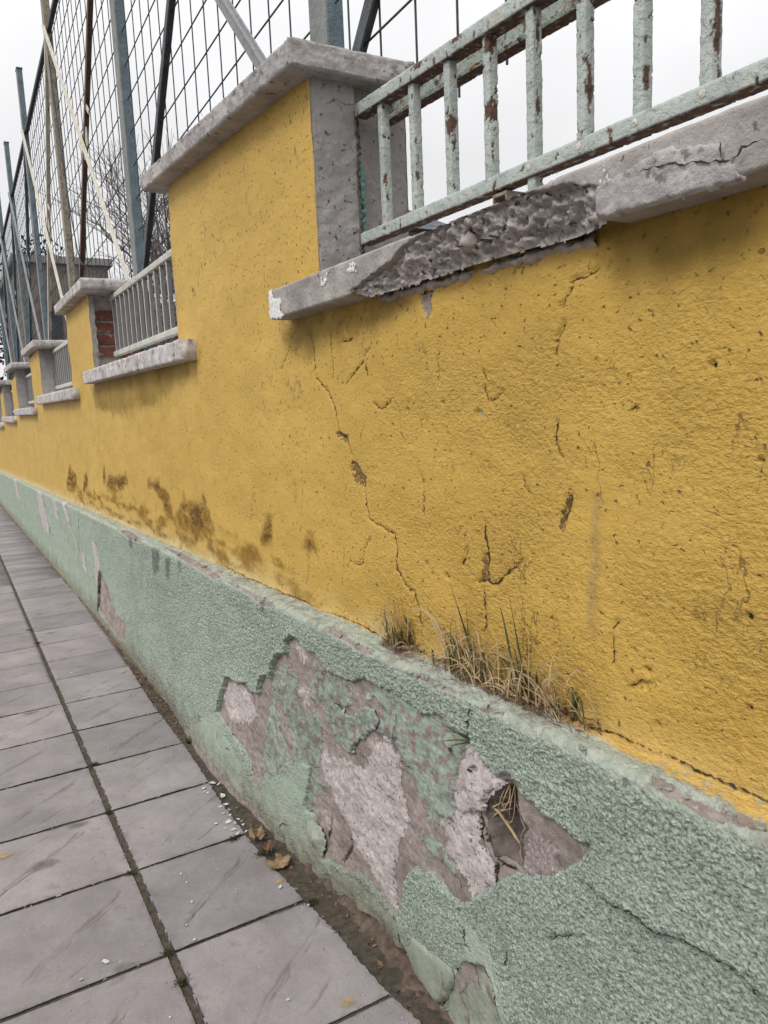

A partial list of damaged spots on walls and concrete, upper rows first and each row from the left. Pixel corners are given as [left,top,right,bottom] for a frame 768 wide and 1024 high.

crack [640,139,765,179]
spalling [356,168,610,318]
crack [282,332,370,455]
peeling [81,540,126,641]
damp [66,466,228,563]
damp [151,549,180,575]
damp [240,517,271,569]
crack [358,500,446,663]
crack [462,524,521,634]
peeling [194,744,273,834]
peeling [220,638,591,913]
crack [552,708,768,802]